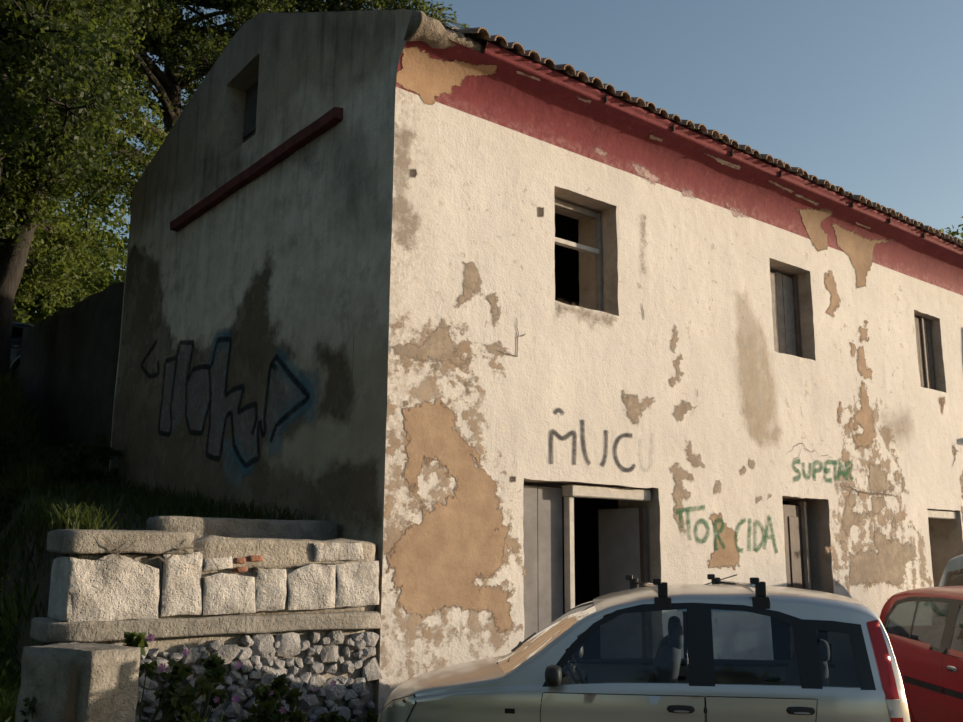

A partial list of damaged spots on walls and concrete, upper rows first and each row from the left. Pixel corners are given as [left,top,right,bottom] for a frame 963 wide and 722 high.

flaking render [396,47,497,105]
flaking render [769,180,893,289]
flaking render [455,261,501,327]
flaking render [824,270,841,317]
leakage [109,245,381,532]
flaking render [381,316,527,680]
flaking render [622,390,655,424]
flaking render [669,325,684,387]
flaking render [672,400,696,421]
flaking render [670,441,705,533]
leakage [738,331,779,443]
flaking render [825,320,932,591]